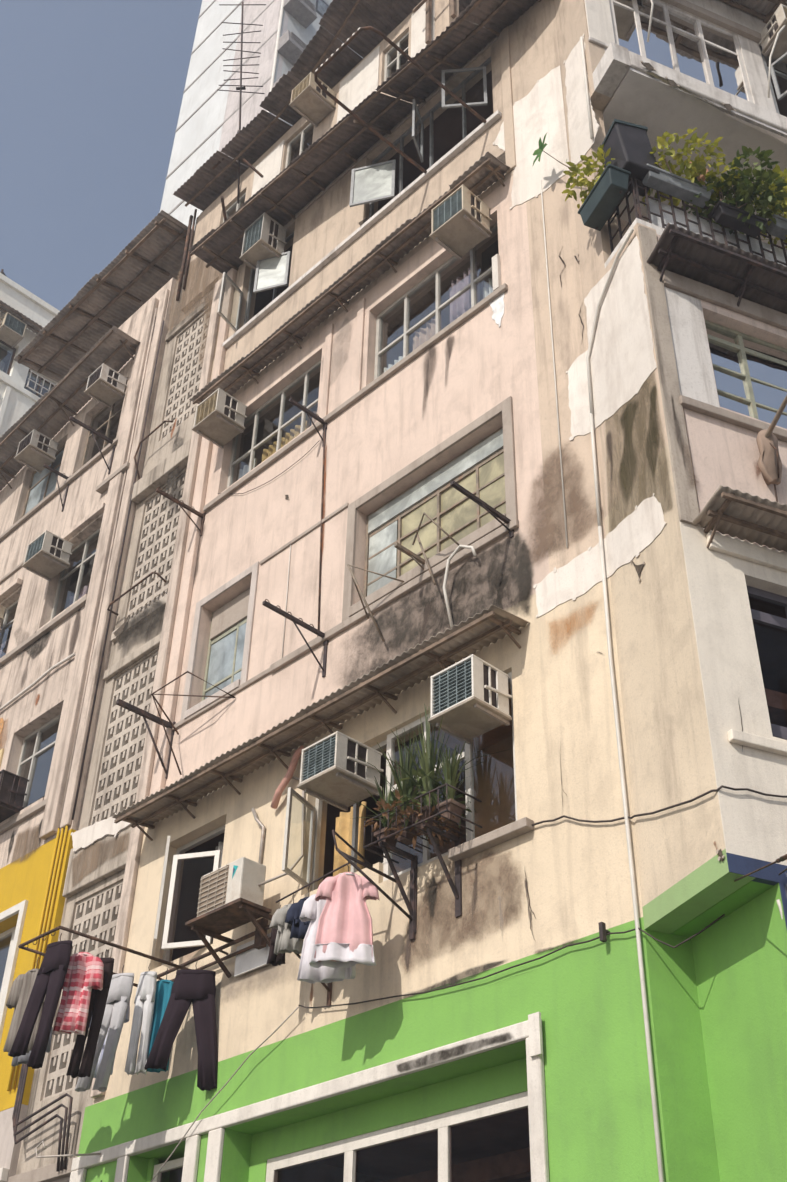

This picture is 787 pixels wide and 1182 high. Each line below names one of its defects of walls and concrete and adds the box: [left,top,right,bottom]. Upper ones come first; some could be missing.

water stain [606,387,659,501]
water stain [347,450,591,684]
water stain [403,851,531,969]